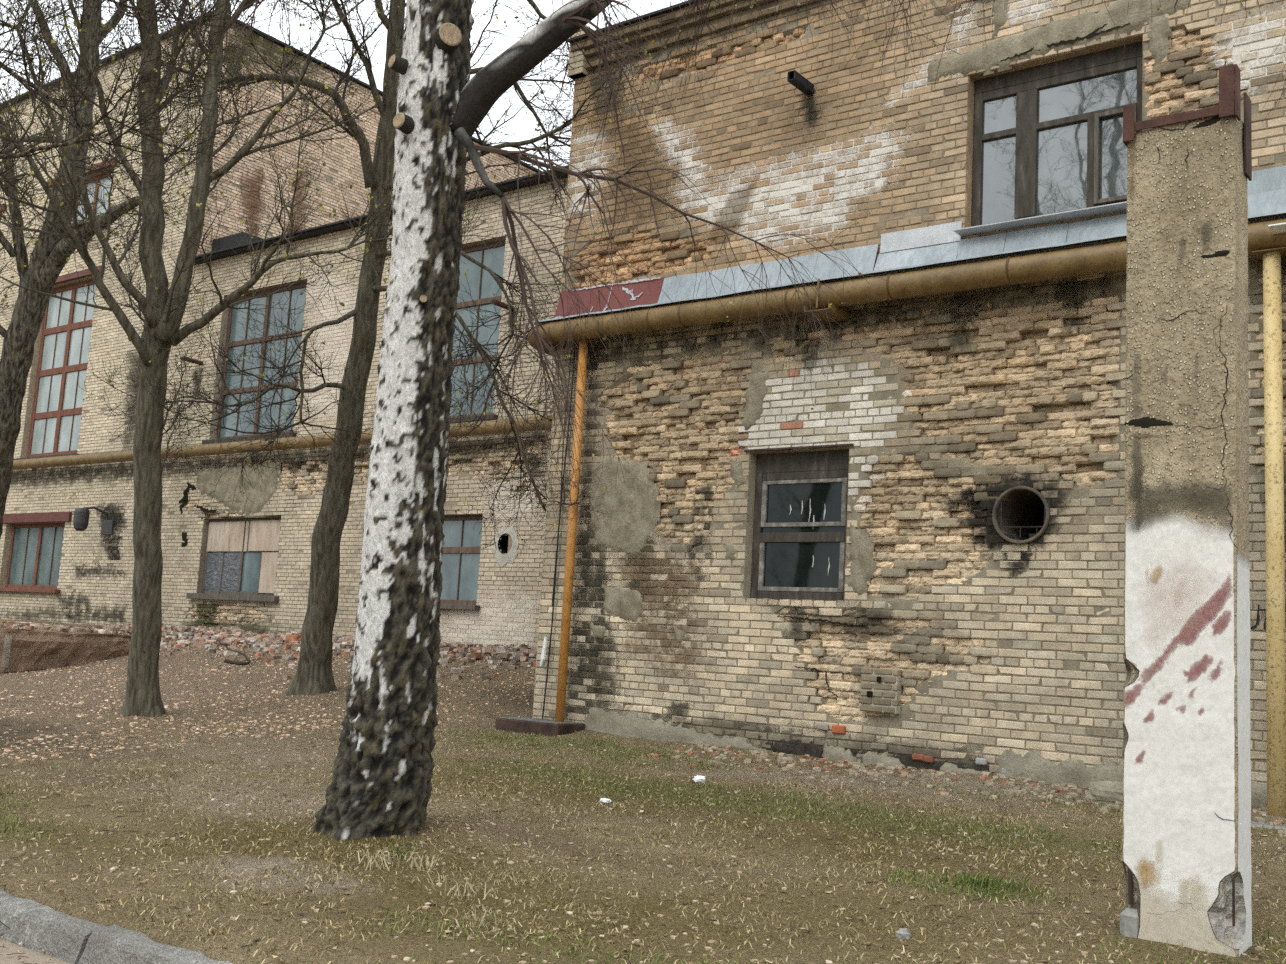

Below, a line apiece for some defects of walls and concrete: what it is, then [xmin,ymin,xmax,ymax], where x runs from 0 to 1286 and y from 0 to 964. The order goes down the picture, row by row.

water stain [757,0,838,23]
spalling [934,0,979,20]
water stain [568,61,623,224]
water stain [649,115,909,251]
water stain [796,95,818,125]
spalling [1144,29,1249,129]
crack [1148,305,1238,553]
water stain [565,325,739,713]
spalling [589,292,1174,773]
water stain [946,488,974,512]
water stain [1000,551,1032,578]
spalling [1208,871,1246,949]